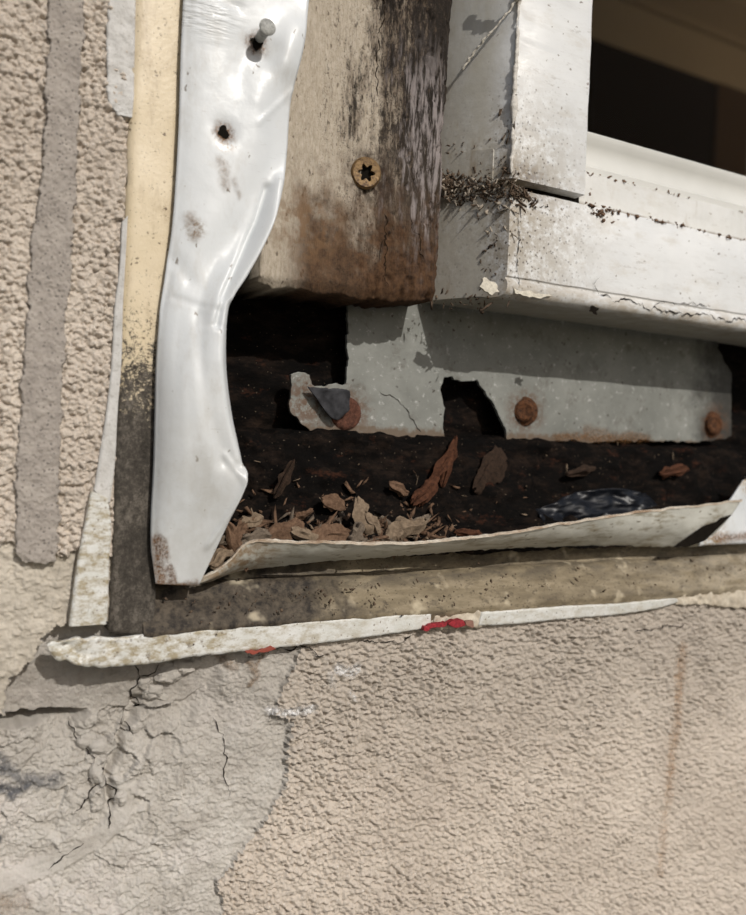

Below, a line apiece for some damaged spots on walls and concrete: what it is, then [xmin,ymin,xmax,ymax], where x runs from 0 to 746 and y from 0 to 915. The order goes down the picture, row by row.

crack [68,720,117,826]
crack [121,666,158,734]
spalling [0,541,302,915]
crack [213,718,230,791]